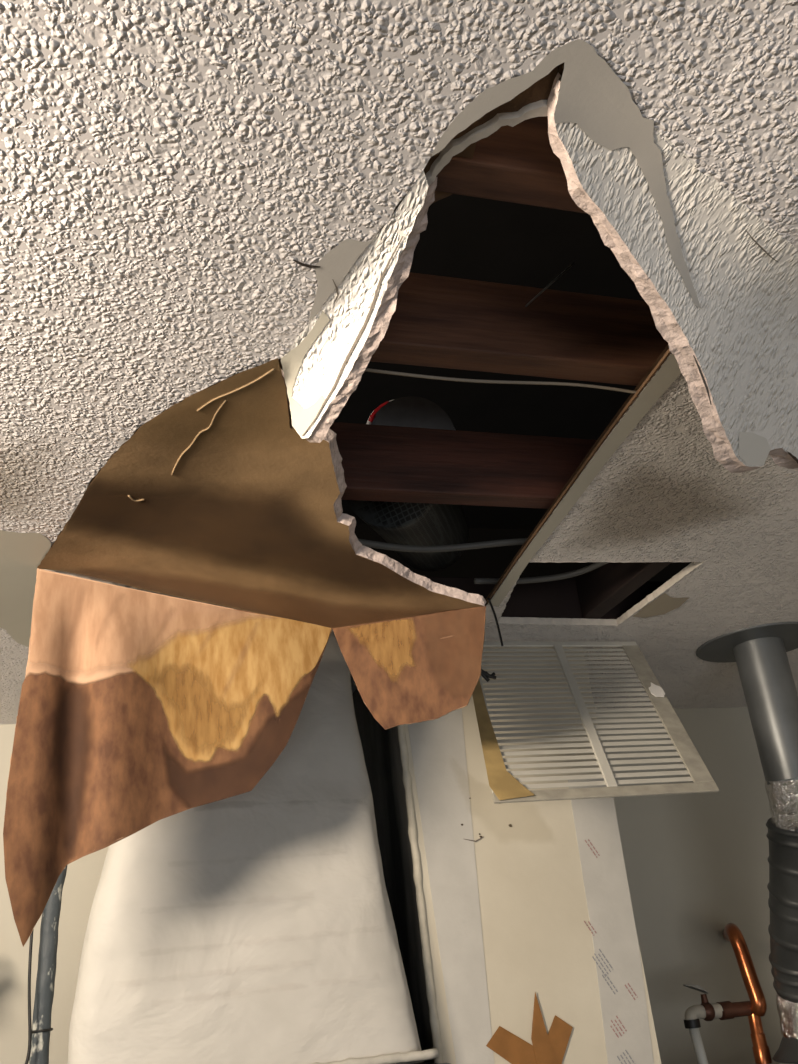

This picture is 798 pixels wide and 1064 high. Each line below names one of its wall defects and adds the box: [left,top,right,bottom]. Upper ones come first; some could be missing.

leakage [68,481,423,589]
spalling [305,73,759,606]
spalling [768,448,798,469]
leakage [3,570,486,946]